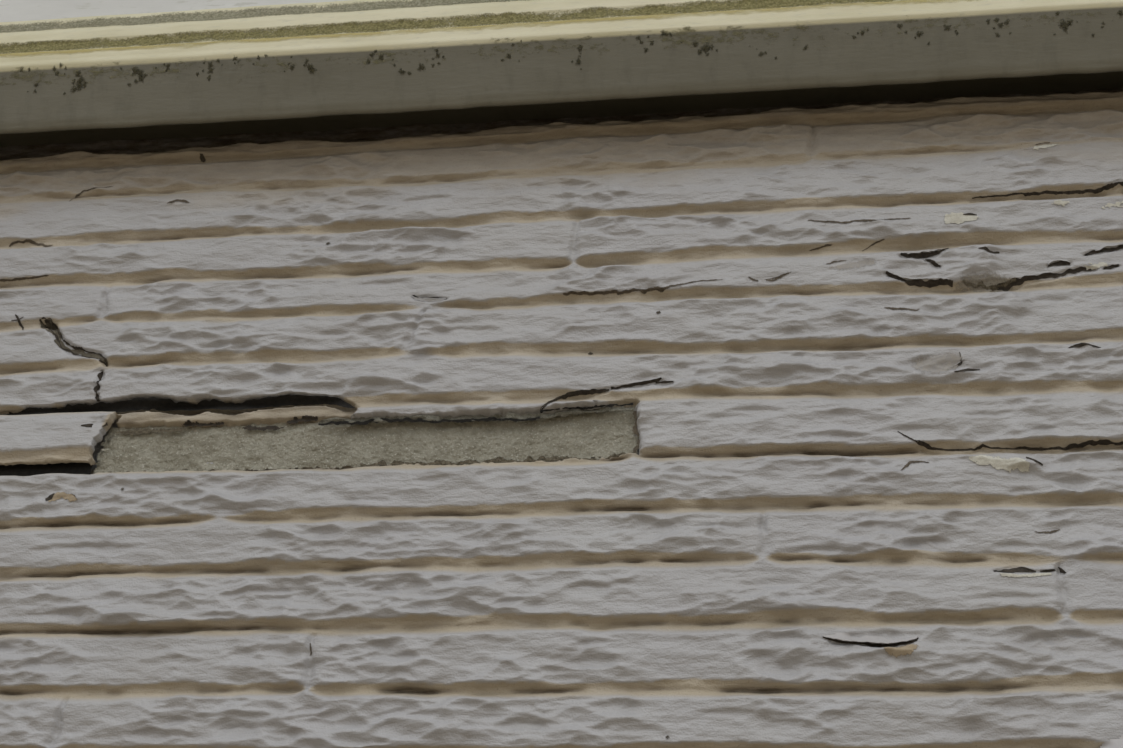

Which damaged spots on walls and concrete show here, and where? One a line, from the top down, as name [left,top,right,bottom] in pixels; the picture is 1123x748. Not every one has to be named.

crack [972,182,1123,199]
crack [9,239,52,247]
crack [0,274,49,282]
crack [563,272,791,296]
crack [808,218,953,311]
crack [997,243,1123,291]
crack [0,314,355,415]
crack [540,377,674,413]
spalling [94,403,640,473]
crack [897,431,1123,470]
crack [823,632,918,647]